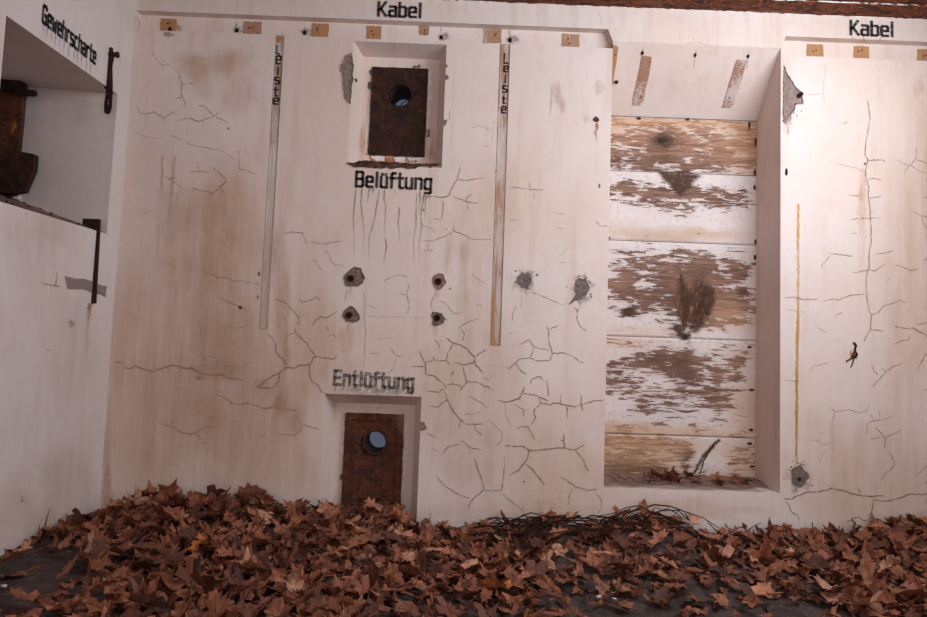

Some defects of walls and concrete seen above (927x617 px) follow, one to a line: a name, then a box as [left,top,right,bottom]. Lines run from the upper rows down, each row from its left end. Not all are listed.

crack [137,77,226,122]
flaking render [340,52,372,104]
flaking render [346,64,439,169]
flaking render [783,66,804,124]
crack [427,170,491,251]
crack [786,104,927,362]
crack [116,297,346,435]
crack [390,292,603,513]
crack [785,415,927,522]